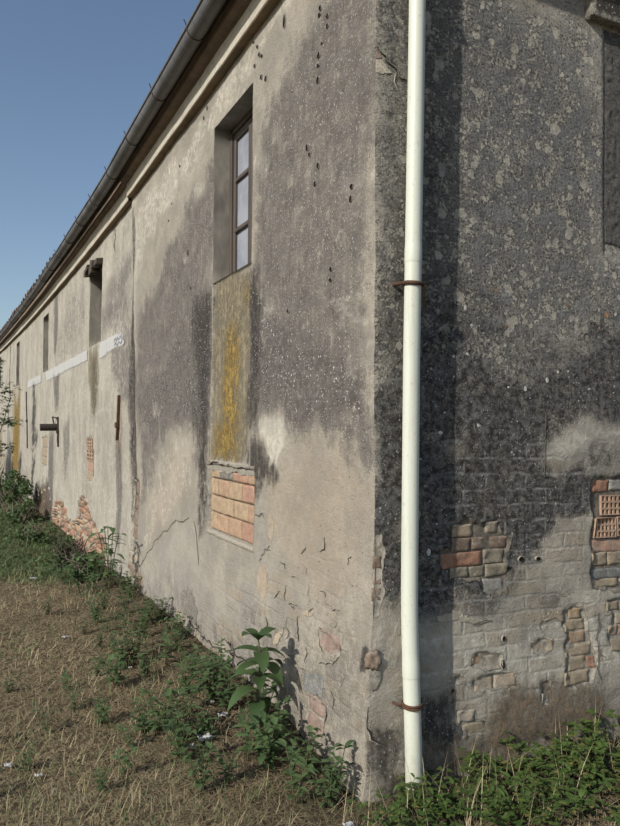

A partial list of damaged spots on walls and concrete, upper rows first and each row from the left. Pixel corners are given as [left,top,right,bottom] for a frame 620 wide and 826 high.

crack [376,45,407,90]
damp [248,267,260,424]
damp [192,293,215,524]
damp [247,439,279,498]
flaking render [427,515,512,596]
flaking render [590,475,620,651]
flaking render [531,637,553,654]
flaking render [543,605,597,689]
crack [596,614,605,678]